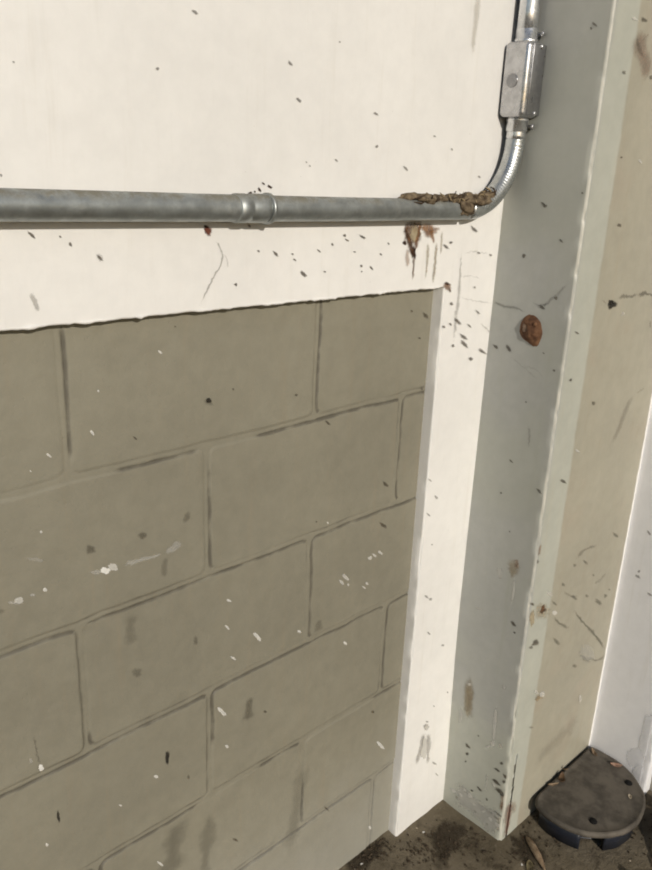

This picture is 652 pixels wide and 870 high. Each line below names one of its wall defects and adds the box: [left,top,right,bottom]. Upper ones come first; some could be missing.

corrosion [403,222,437,279]
corrosion [519,314,542,347]